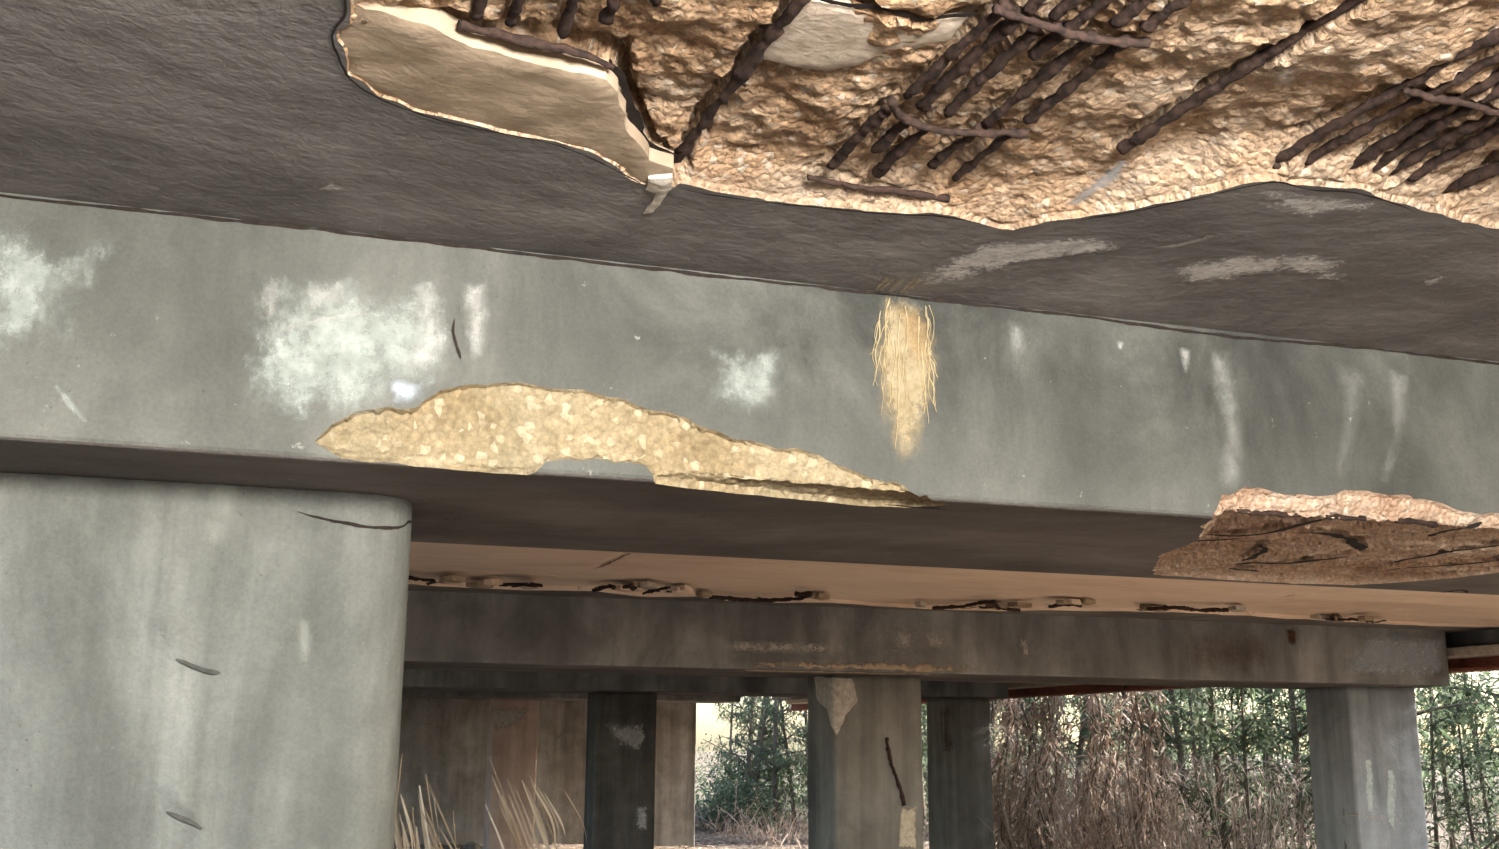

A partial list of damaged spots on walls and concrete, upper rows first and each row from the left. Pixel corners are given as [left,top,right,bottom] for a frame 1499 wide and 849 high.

spalling [336,0,1499,230]
leakage [0,248,51,330]
leakage [262,295,441,401]
leakage [470,289,482,344]
leakage [926,237,1116,282]
leakage [1175,253,1344,282]
spalling [315,382,949,508]
crack [300,512,413,530]
crack [598,553,672,593]
spalling [408,487,1499,627]